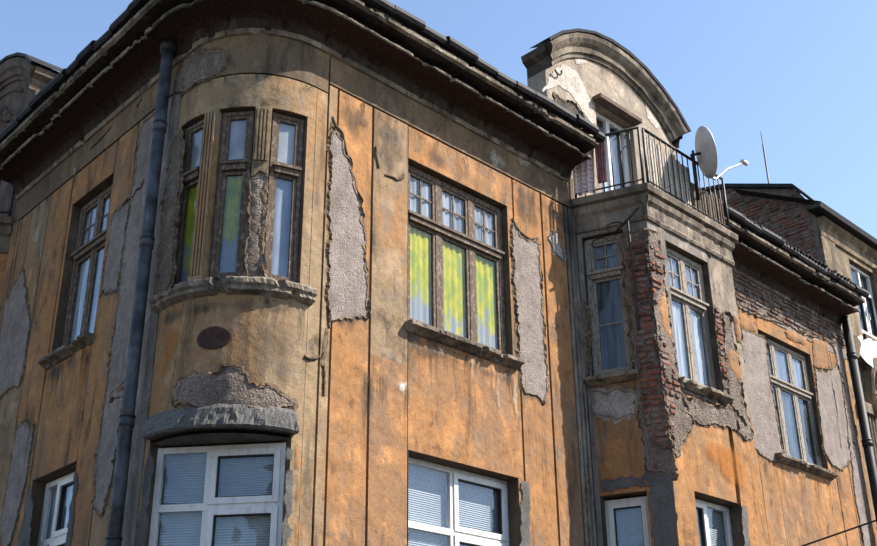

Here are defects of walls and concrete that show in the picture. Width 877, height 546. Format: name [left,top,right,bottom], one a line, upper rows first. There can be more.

flaking render [173,48,231,96]
flaking render [154,129,186,295]
flaking render [324,125,371,324]
flaking render [0,266,32,400]
flaking render [91,112,155,519]
flaking render [171,365,298,412]
flaking render [509,222,567,406]
flaking render [580,299,593,377]
flaking render [591,228,873,546]
flaking render [0,419,37,546]